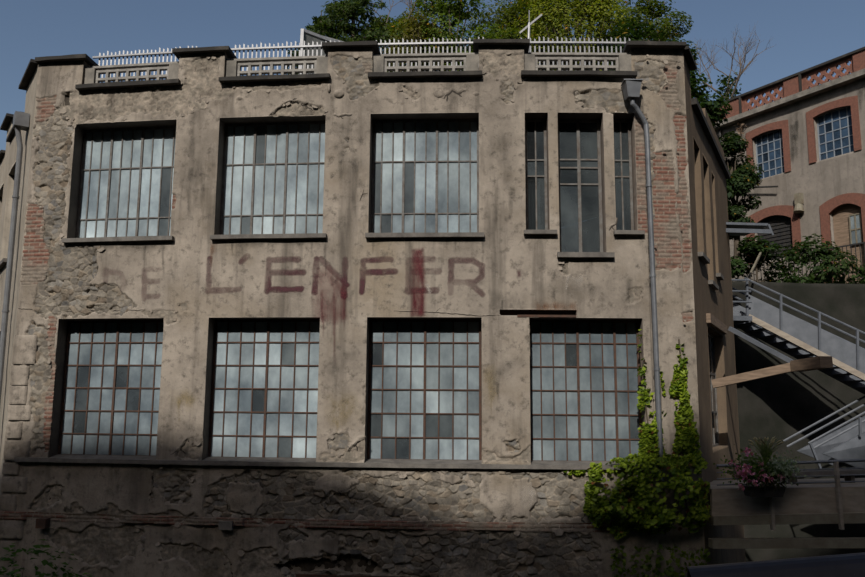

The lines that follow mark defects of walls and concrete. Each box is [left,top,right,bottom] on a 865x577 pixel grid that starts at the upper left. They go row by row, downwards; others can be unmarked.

peeling [331,55,379,100]
peeling [479,52,524,104]
flaking render [575,54,692,278]
flaking render [20,55,328,457]
flaking render [150,438,203,505]
flaking render [203,434,601,577]